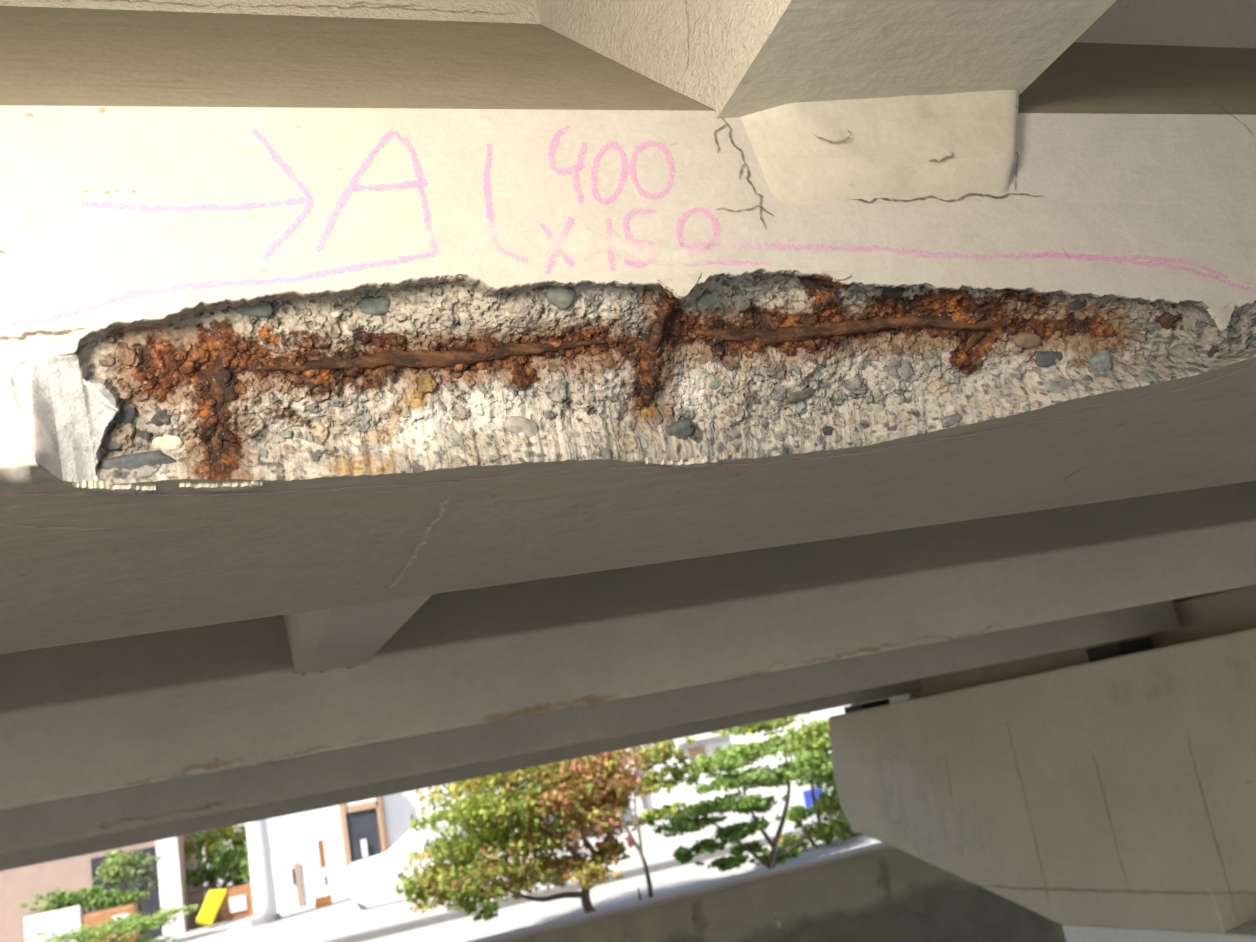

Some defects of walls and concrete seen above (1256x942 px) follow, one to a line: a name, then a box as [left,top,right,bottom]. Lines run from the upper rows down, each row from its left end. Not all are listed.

crack [817,130,851,143]
crack [714,110,773,228]
crack [855,152,1040,203]
crack [0,328,85,340]
spalling [11,268,1256,494]